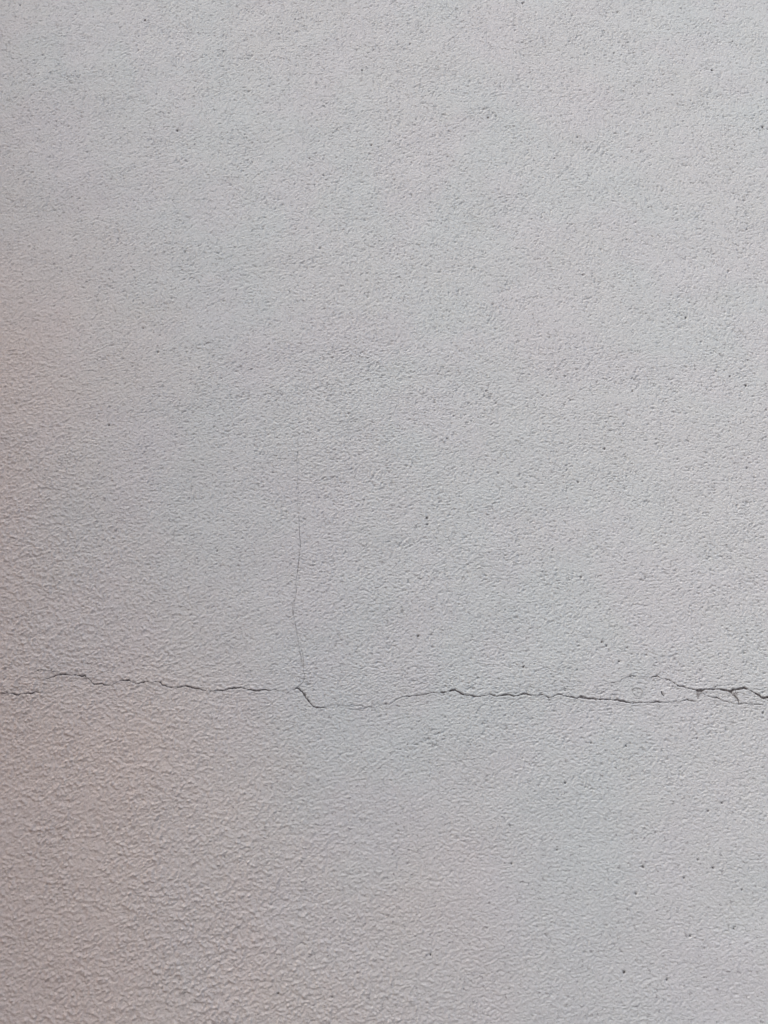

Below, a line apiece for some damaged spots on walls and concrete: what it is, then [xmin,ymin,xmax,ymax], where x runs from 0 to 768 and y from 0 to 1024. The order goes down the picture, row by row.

crack [3,436,768,709]